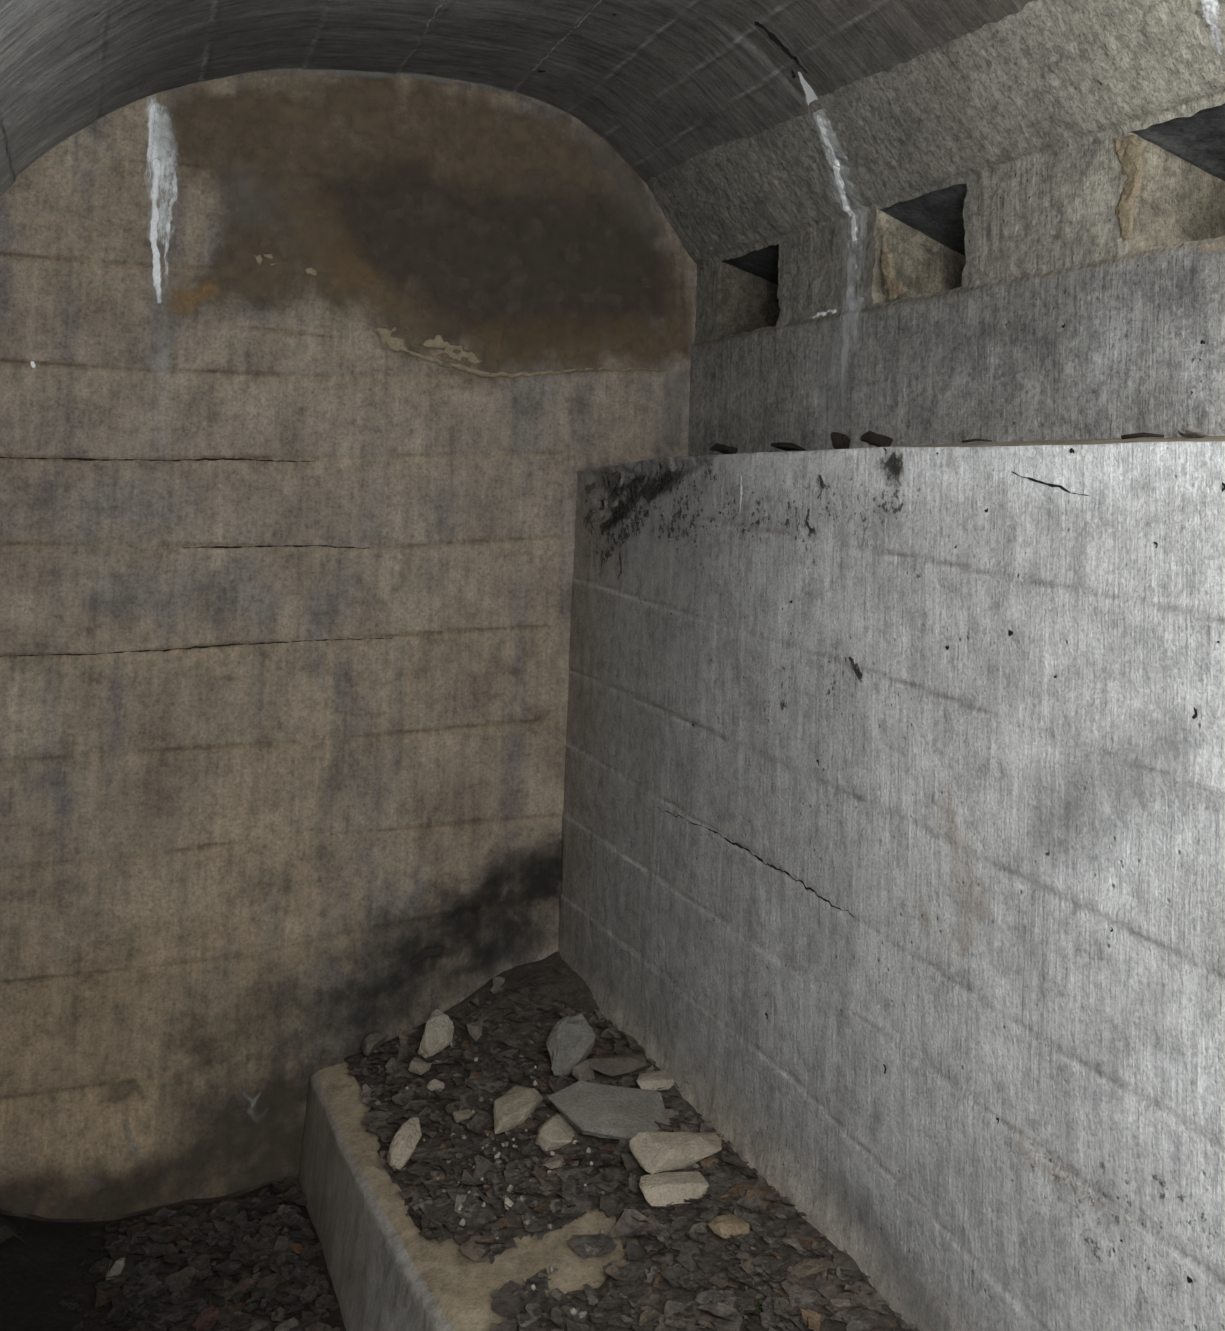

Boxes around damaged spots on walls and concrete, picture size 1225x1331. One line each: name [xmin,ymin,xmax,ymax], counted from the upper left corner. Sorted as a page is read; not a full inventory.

water stain [1201,0,1221,54]
water stain [147,69,689,379]
water stain [798,72,867,388]
water stain [320,842,563,1066]